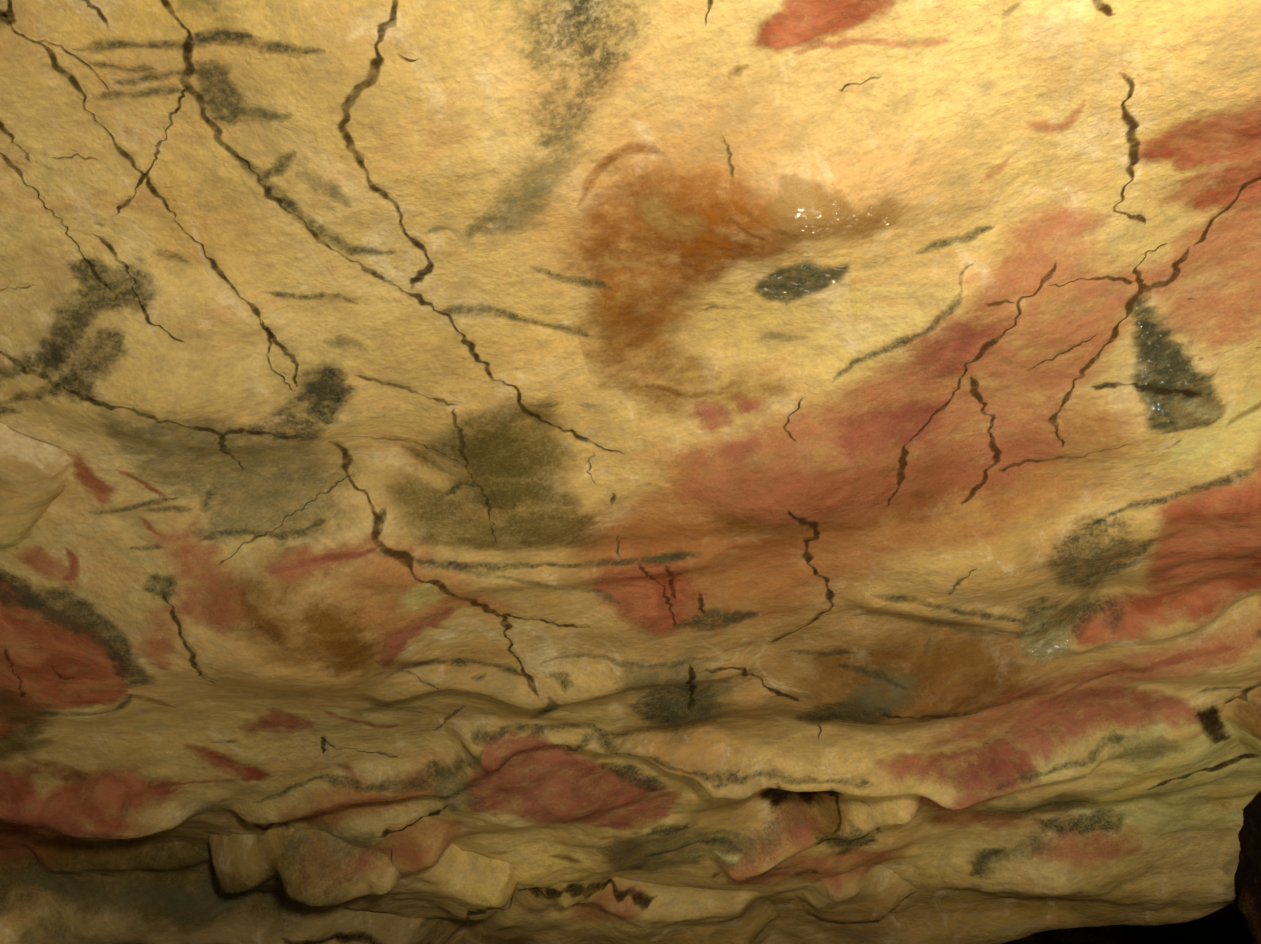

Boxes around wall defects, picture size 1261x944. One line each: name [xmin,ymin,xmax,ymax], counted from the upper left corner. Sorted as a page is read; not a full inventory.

damp [89,31,322,122]
damp [759,0,891,51]
crack [1096,0,1113,16]
crack [0,0,621,501]
damp [236,155,393,255]
crack [888,75,1261,506]
damp [1139,107,1261,343]
crack [0,351,592,695]
damp [75,212,1222,689]
crack [771,512,834,642]
crack [685,666,799,709]
damp [280,703,869,874]